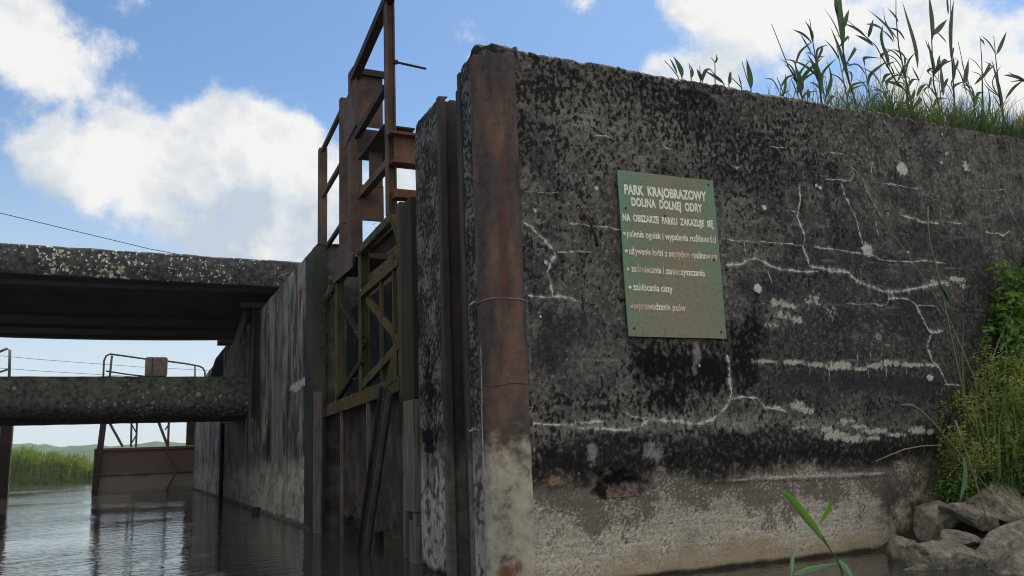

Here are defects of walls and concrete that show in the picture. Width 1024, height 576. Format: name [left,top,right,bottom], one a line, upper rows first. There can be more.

crack [524,223,621,302]
crack [722,152,961,392]
crack [533,355,788,439]
water stain [535,419,934,477]
rust [497,562,522,576]